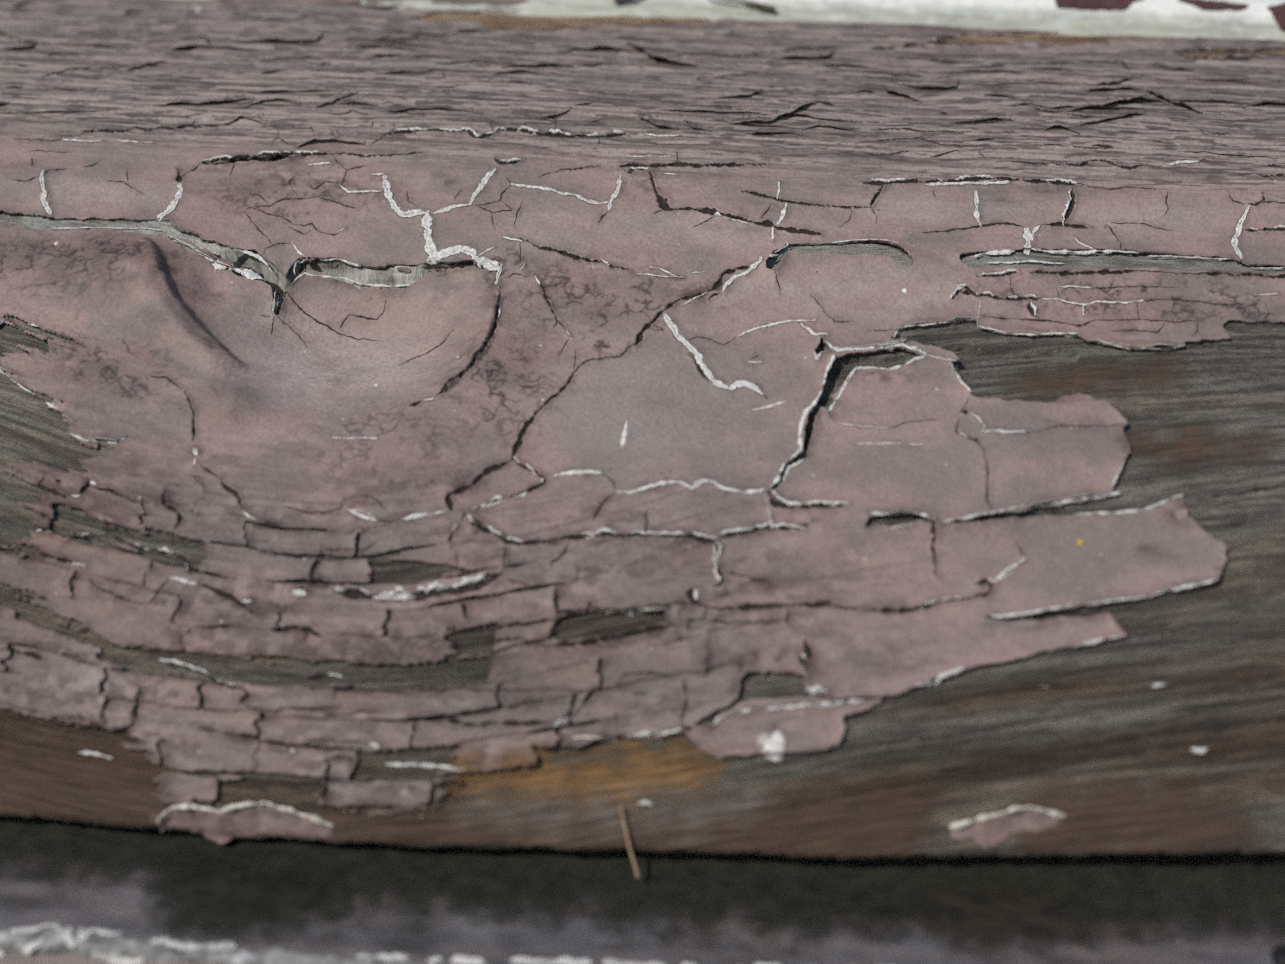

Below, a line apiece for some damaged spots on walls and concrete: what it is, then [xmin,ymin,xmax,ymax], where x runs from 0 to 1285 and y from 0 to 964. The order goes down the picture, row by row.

peeling [1054,0,1139,11]
peeling [1178,0,1249,11]
peeling [1267,3,1285,31]
peeling [1102,255,1285,274]
crack [0,25,1285,695]
peeling [0,302,1285,859]
crack [40,686,143,732]
crack [158,659,709,802]
crack [837,714,1285,773]